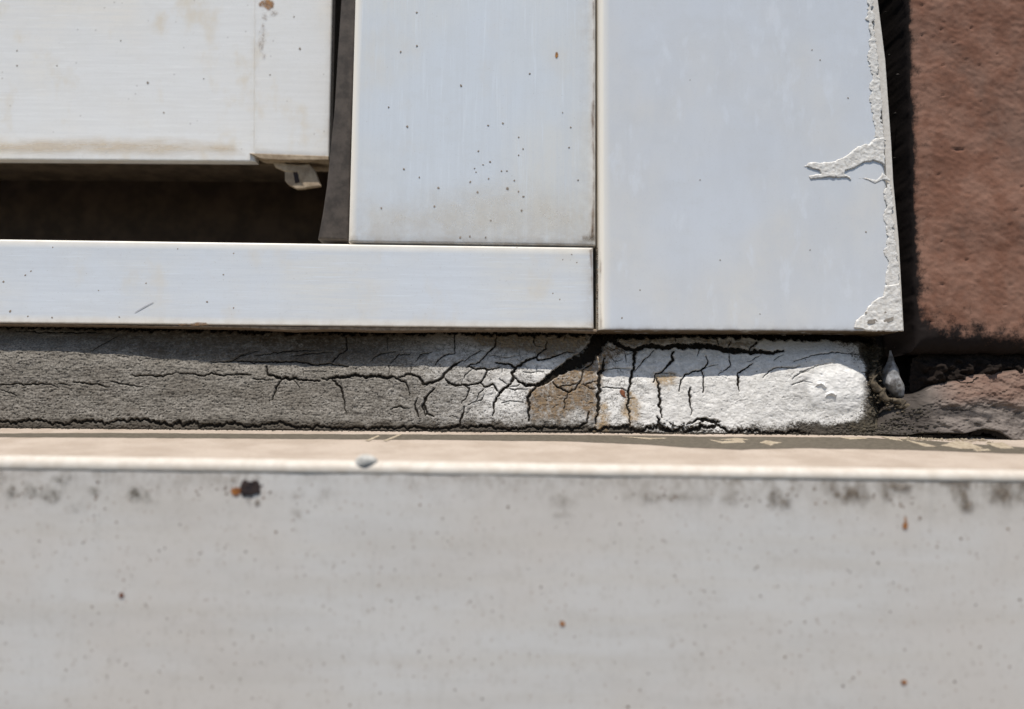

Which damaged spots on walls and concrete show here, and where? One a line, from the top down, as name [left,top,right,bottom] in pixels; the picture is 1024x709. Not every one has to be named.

peeling [804,0,903,332]
crack [0,327,873,435]